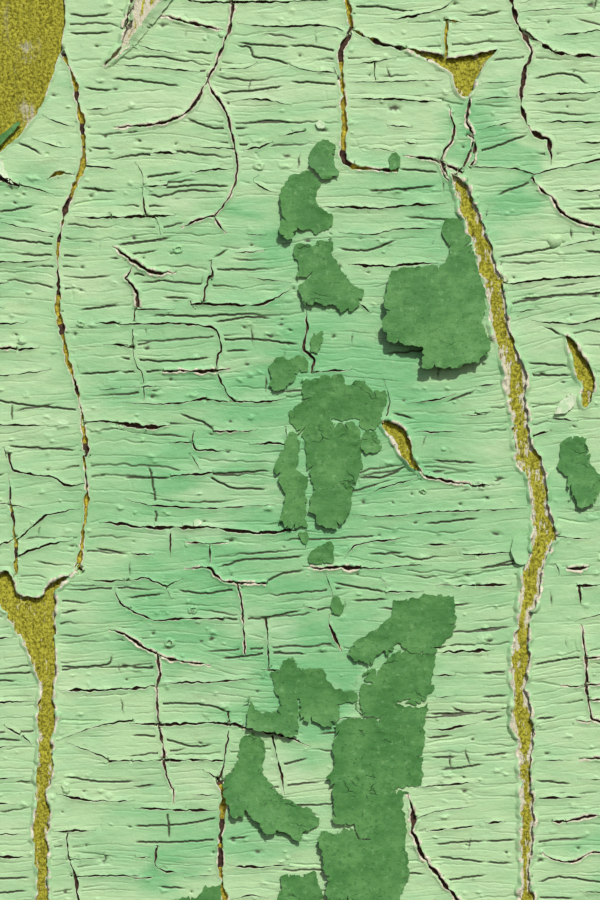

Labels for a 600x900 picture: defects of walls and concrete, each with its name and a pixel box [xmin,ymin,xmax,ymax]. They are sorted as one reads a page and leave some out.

peeling [0,0,70,156]
crack [0,0,600,654]
peeling [279,139,364,313]
peeling [0,564,83,900]
crack [53,618,310,900]
peeling [222,593,457,900]
peeling [268,331,423,564]
crack [405,778,505,900]
crack [433,644,494,701]
peeling [382,171,600,900]
crack [536,752,600,827]
crack [553,533,600,728]